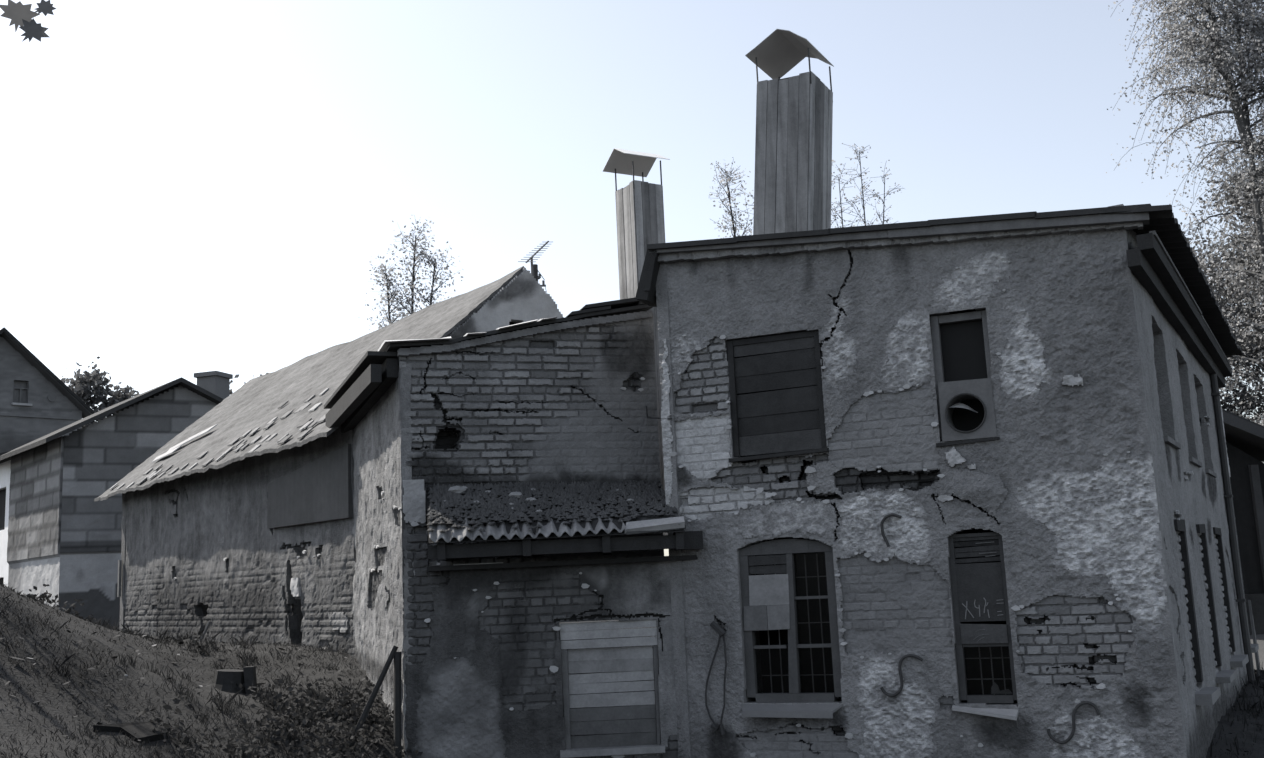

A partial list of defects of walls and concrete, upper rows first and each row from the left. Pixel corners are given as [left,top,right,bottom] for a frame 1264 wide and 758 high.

crack [820,250,853,360]
crack [411,352,537,450]
flaking render [620,373,645,392]
flaking render [661,246,1083,758]
flaking render [1011,451,1182,758]